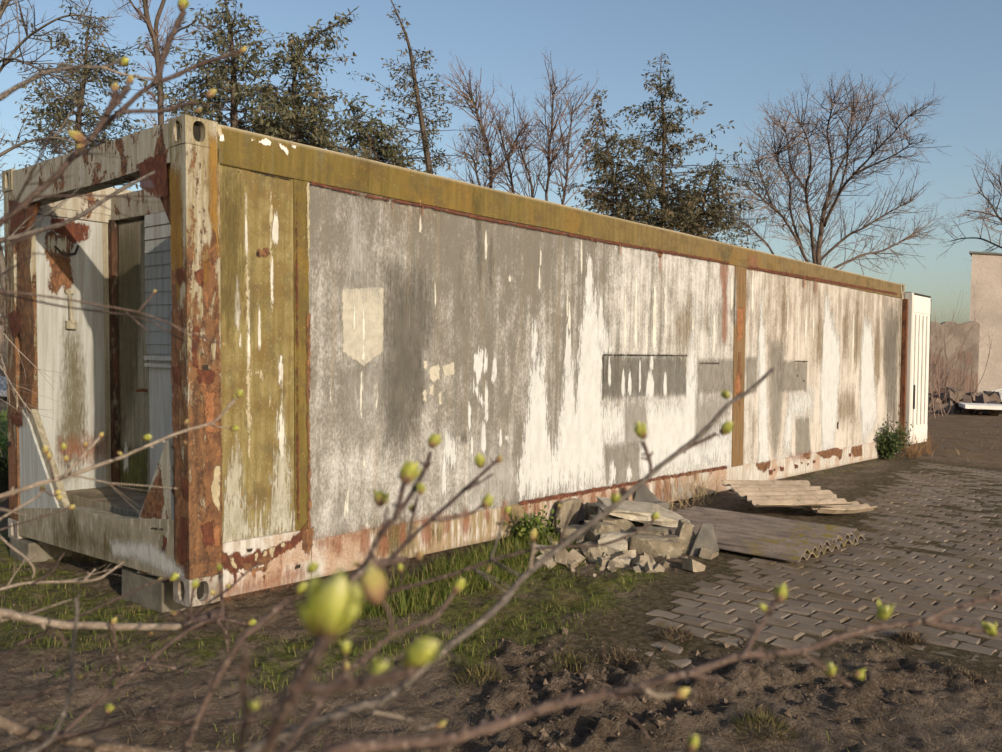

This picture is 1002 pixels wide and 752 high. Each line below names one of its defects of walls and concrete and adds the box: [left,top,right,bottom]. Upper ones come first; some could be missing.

rust [8,200,35,426]
rust [44,217,91,294]
rust [138,137,341,594]
damp [347,203,381,424]
rust [311,181,744,405]
damp [608,275,694,444]
damp [782,292,822,361]
damp [843,304,859,383]
damp [696,392,730,445]
damp [609,461,632,486]
rust [518,465,727,513]
rust [756,445,863,475]